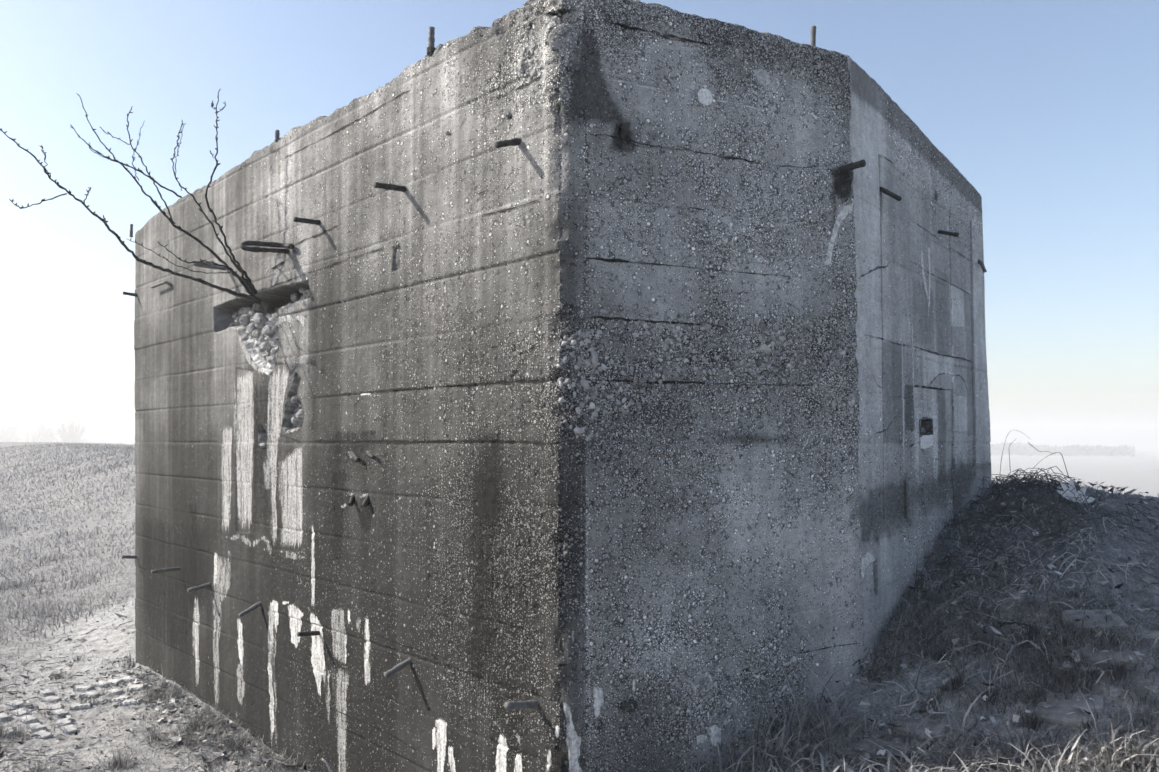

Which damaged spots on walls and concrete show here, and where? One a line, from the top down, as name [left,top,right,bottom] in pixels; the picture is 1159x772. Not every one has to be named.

leakage [573,31,624,122]
peeling [217,288,310,560]